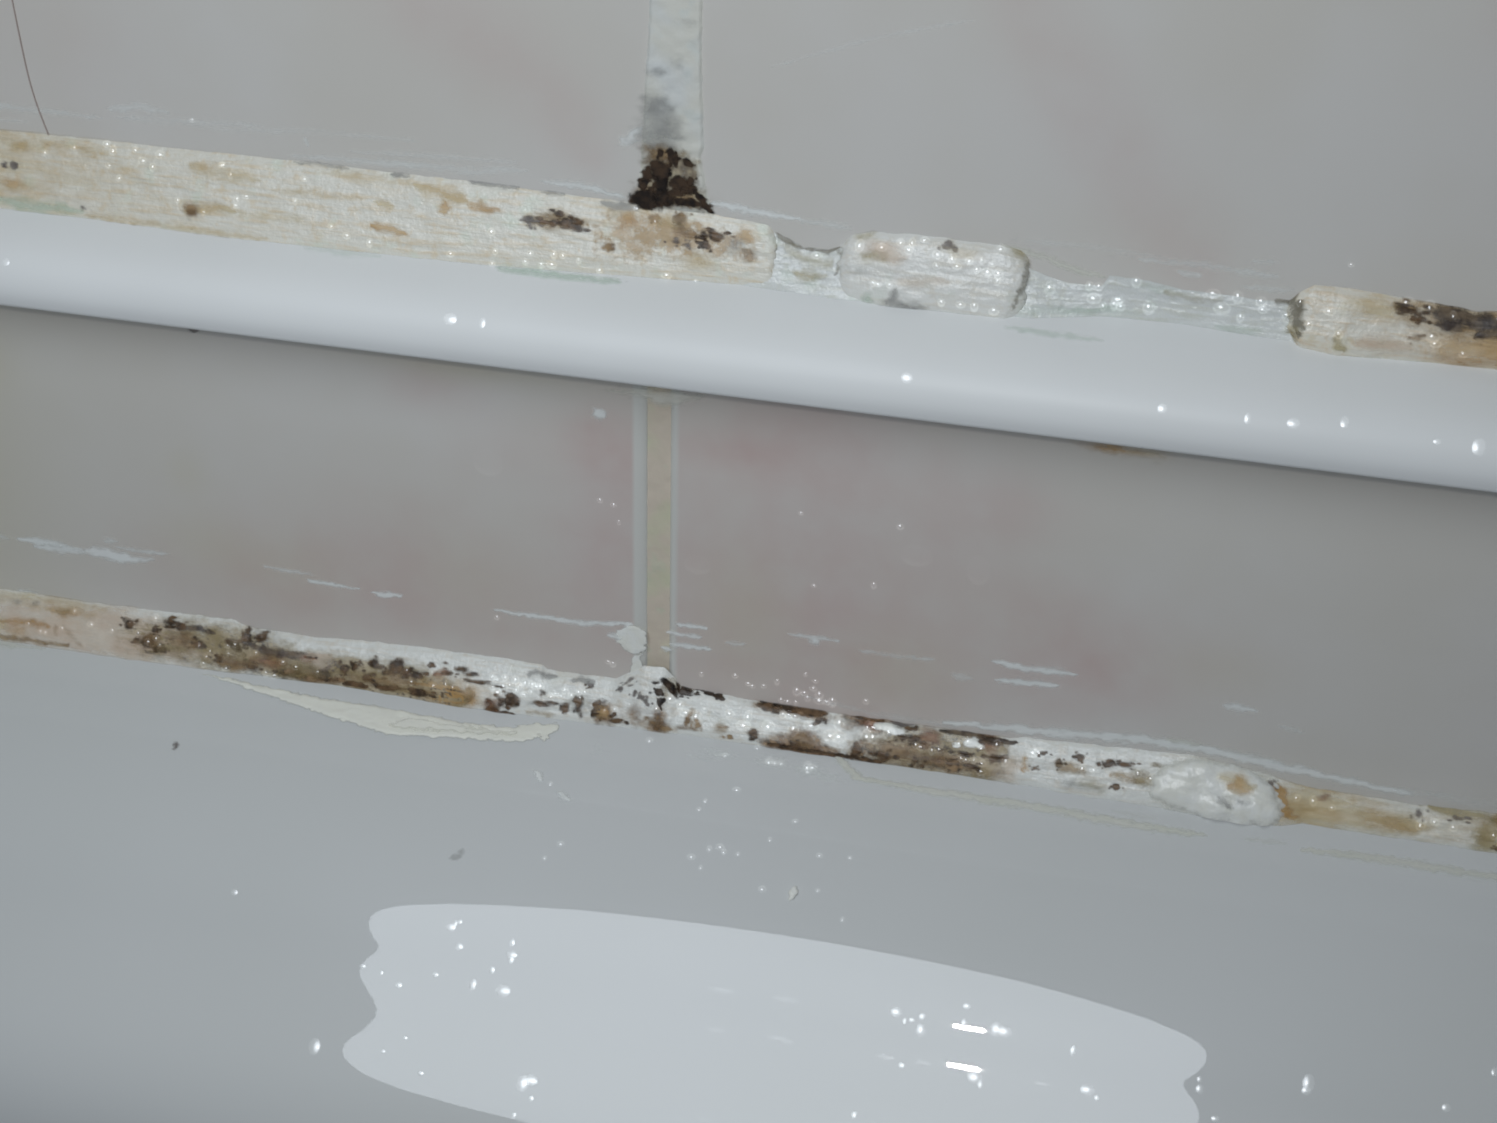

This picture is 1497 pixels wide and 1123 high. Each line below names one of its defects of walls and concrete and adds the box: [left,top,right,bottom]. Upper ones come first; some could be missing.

damp [520,99,753,261]
damp [1394,298,1497,339]
damp [119,616,1018,779]
damp [1022,751,1159,790]